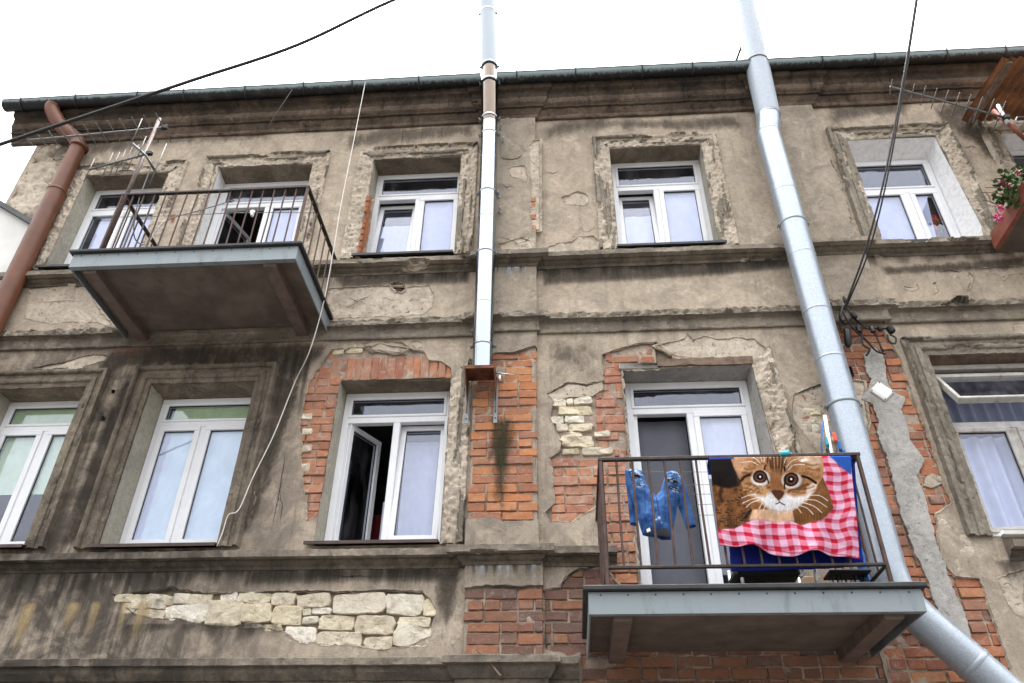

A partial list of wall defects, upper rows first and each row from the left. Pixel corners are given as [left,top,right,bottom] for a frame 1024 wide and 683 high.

flaking render [498,139,542,250]
flaking render [325,281,435,320]
flaking render [31,353,108,370]
flaking render [298,339,452,522]
flaking render [463,332,966,683]
flaking render [836,324,1015,675]
flaking render [111,577,439,651]